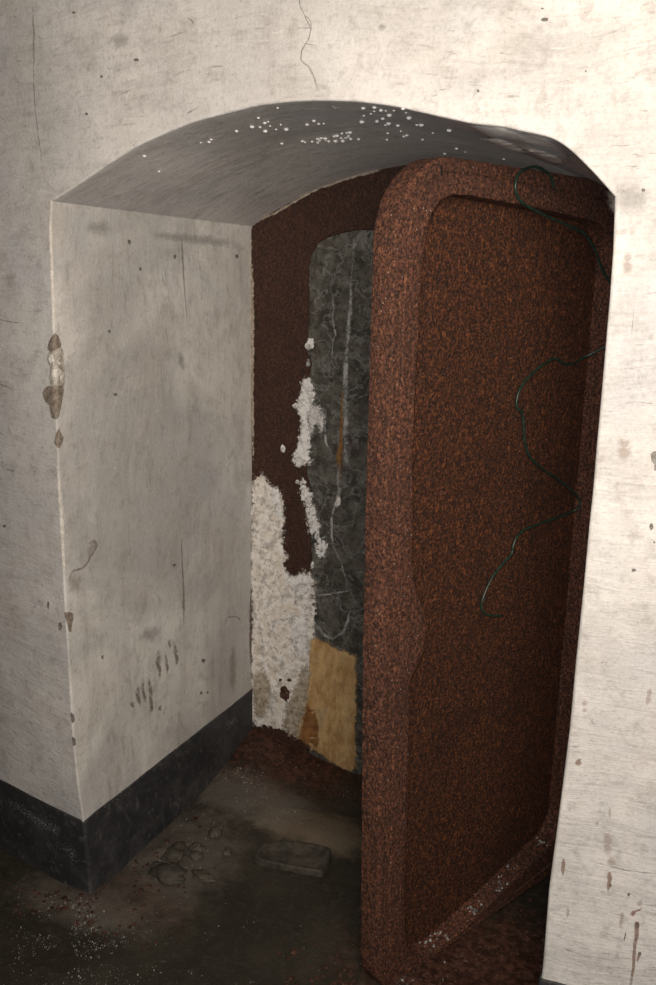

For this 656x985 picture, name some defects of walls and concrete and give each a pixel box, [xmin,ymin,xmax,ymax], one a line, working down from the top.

flaking render [43,217,65,448]
corrosion [620,893,641,981]